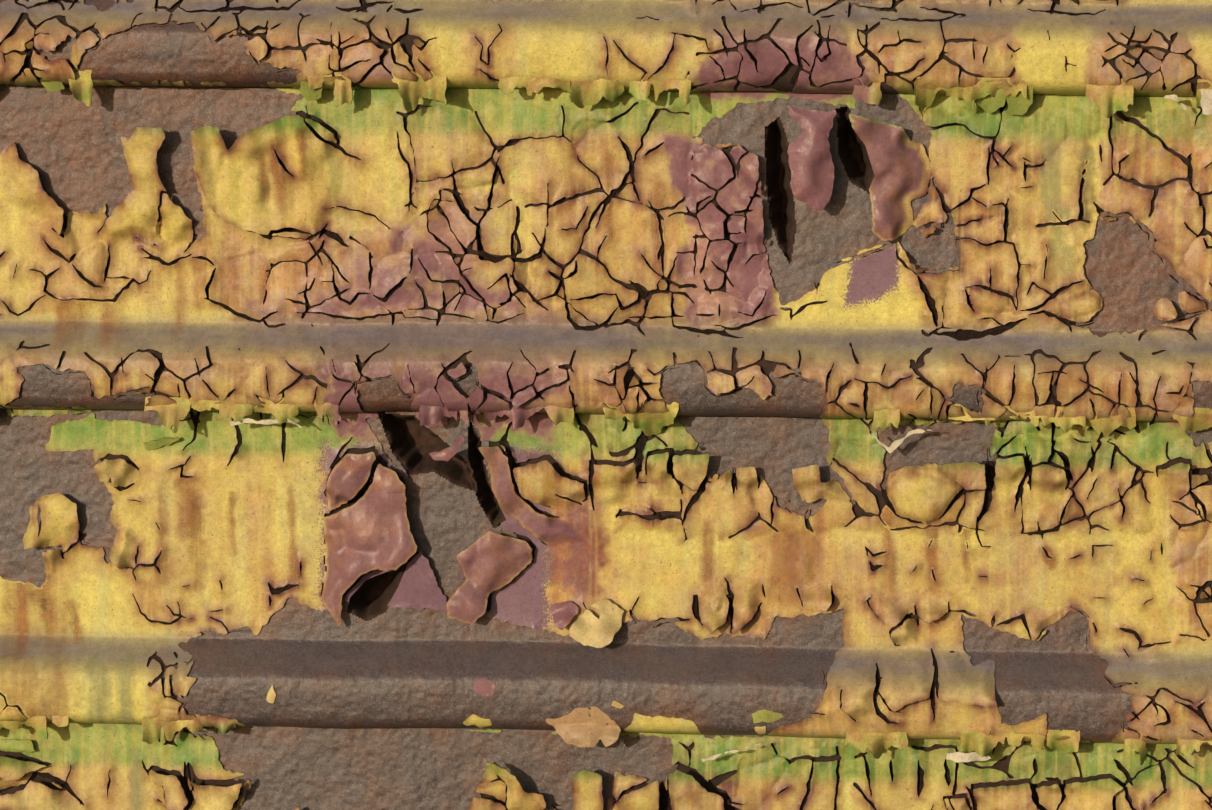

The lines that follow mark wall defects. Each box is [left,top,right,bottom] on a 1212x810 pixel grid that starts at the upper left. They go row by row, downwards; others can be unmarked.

crack [77,0,301,73]
crack [317,2,437,73]
crack [603,0,1021,83]
peeling [1054,0,1132,13]
crack [1028,0,1161,71]
peeling [0,0,1062,342]
peeling [902,16,1212,347]
crack [0,132,1184,581]
crack [115,483,241,634]
peeling [0,335,1212,810]
crack [629,578,766,628]
crack [951,610,1031,638]